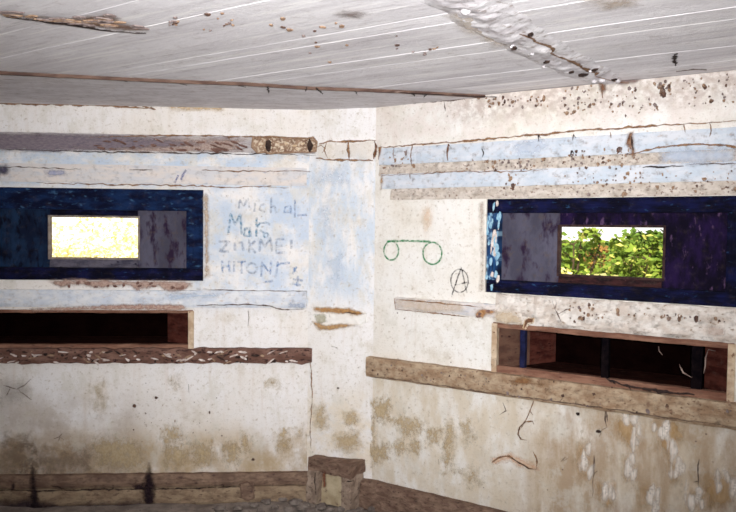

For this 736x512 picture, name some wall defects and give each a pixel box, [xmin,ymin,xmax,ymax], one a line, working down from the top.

spalling [0,11,149,34]
crack [378,120,736,176]
spalling [312,307,367,330]
peeling [0,350,297,365]
damp [337,434,357,450]
damp [370,399,453,465]
crack [369,376,736,470]